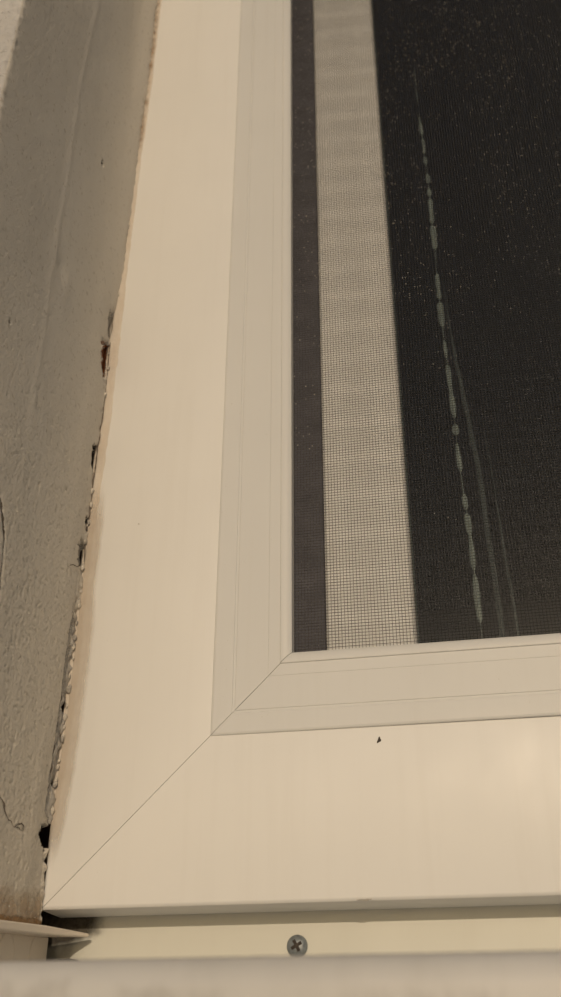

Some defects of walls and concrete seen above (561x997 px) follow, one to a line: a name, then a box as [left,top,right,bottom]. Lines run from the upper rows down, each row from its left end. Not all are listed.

crack [0,498,8,587]
crack [0,797,24,829]